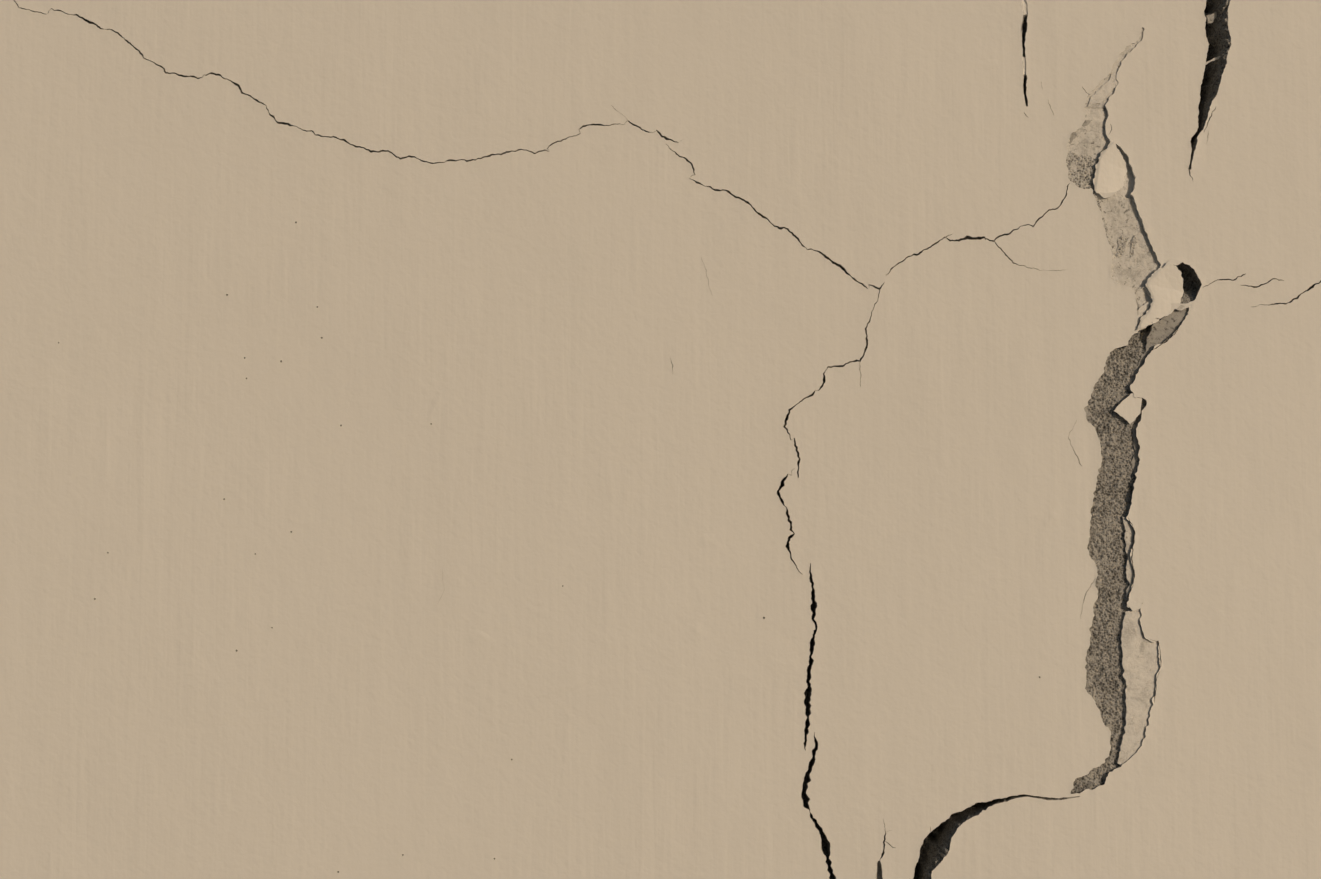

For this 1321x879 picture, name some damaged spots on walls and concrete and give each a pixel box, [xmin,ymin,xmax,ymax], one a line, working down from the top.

crack [14,0,1070,879]
spalling [1066,28,1204,794]
crack [1188,0,1231,180]
crack [1204,273,1321,307]